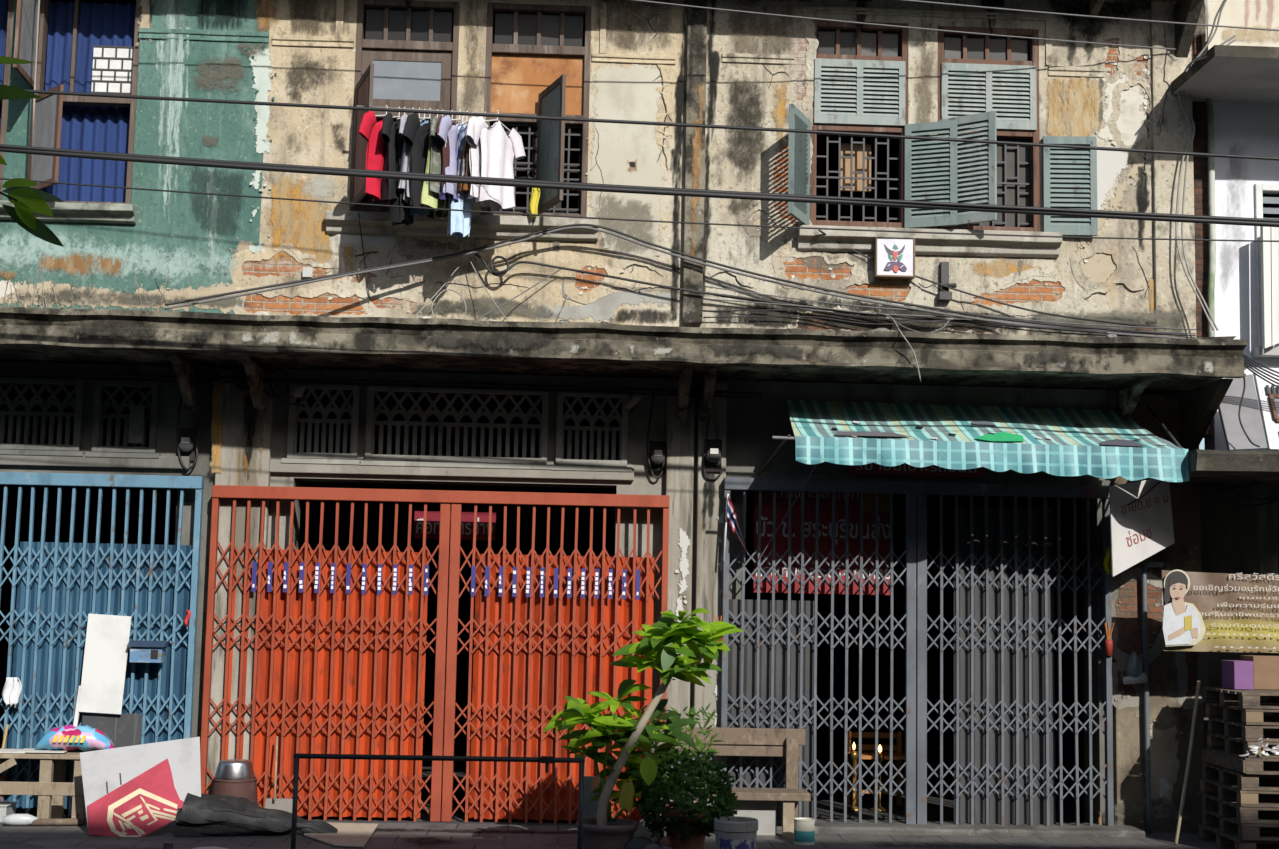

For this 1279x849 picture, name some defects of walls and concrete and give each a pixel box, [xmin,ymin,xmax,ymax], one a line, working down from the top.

damp [1049,0,1151,66]
crack [1202,0,1210,42]
peeling [244,42,277,154]
peeling [249,170,271,192]
peeling [562,63,666,304]
damp [597,197,652,251]
damp [617,0,764,323]
spalling [941,29,1155,337]
damp [1137,165,1149,248]
spalling [0,235,471,318]
crack [974,246,1152,300]
damp [715,295,1184,365]